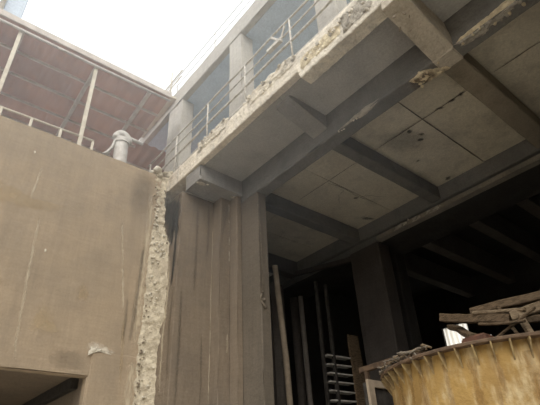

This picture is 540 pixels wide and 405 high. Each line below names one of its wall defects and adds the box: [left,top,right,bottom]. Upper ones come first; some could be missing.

spalling [454,0,526,46]
spalling [246,0,372,106]
spalling [409,62,451,88]
spalling [197,117,228,154]
spalling [338,99,378,132]
crack [379,90,482,161]
leakage [165,196,180,284]
spalling [126,176,170,405]
spalling [88,346,111,355]